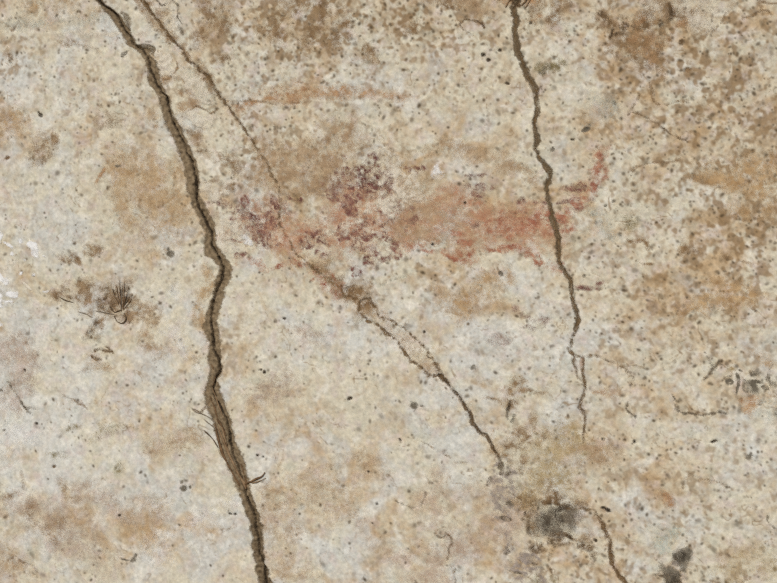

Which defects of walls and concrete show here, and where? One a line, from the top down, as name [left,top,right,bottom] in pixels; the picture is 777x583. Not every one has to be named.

crack [91,346,115,361]
crack [95,0,515,583]
crack [509,0,644,441]
crack [580,507,628,583]